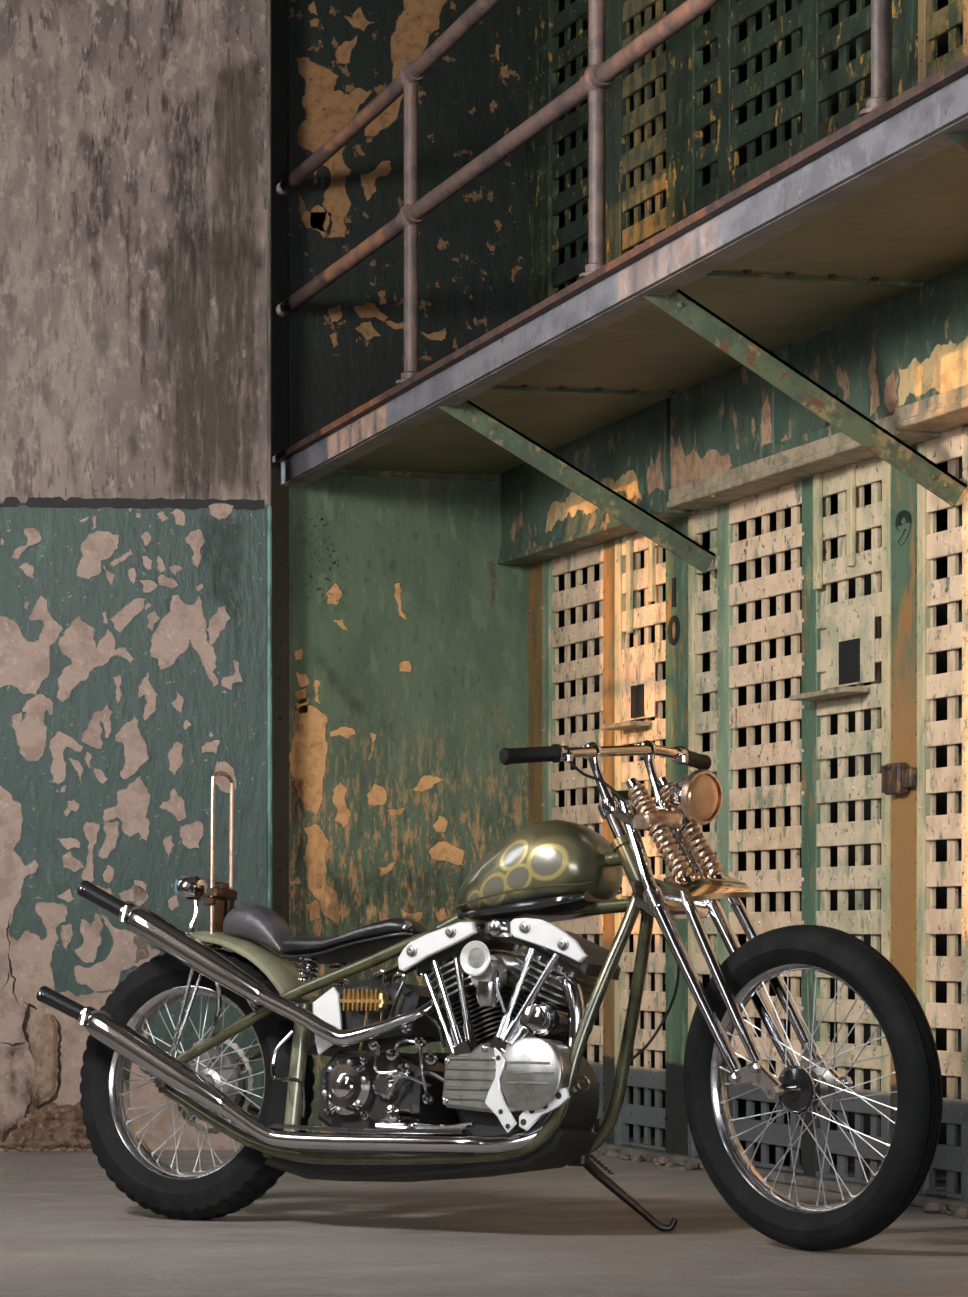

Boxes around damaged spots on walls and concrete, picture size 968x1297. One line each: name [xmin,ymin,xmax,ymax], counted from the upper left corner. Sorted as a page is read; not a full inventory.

peeling [390,0,448,81]
peeling [296,6,404,238]
peeling [327,291,404,348]
peeling [868,335,968,417]
peeling [761,393,772,447]
peeling [601,436,733,500]
peeling [208,503,234,521]
peeling [545,492,598,533]
peeling [289,648,377,926]
peeling [366,774,444,816]
peeling [0,509,244,1152]
peeling [427,815,464,866]